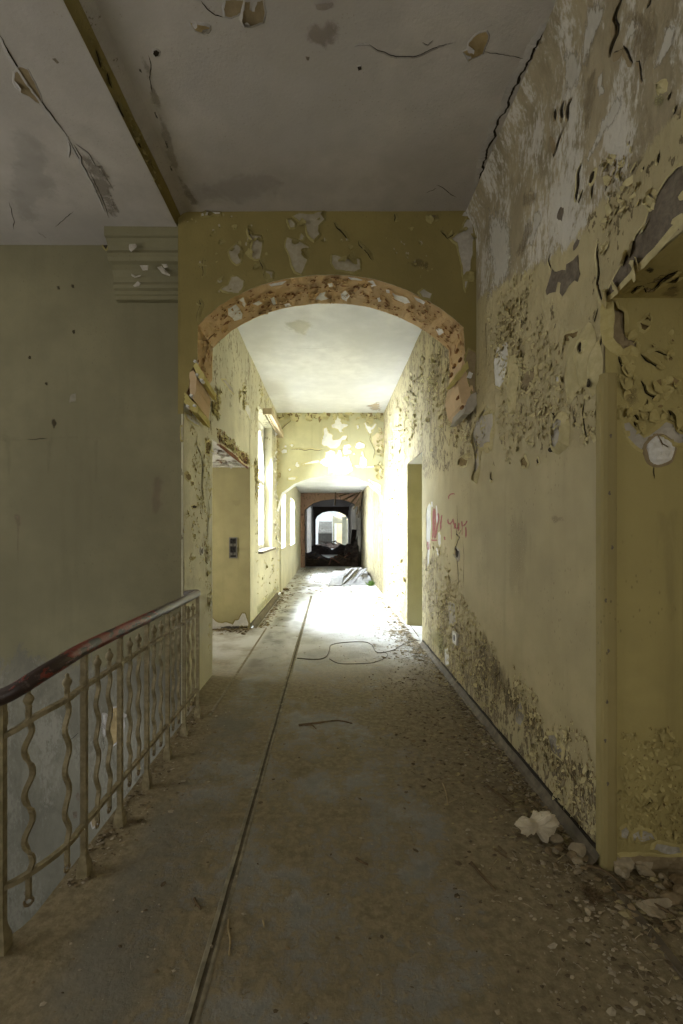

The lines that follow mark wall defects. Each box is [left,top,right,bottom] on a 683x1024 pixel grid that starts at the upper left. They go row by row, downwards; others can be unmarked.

peeling [462,30,490,61]
flaking render [588,146,683,453]